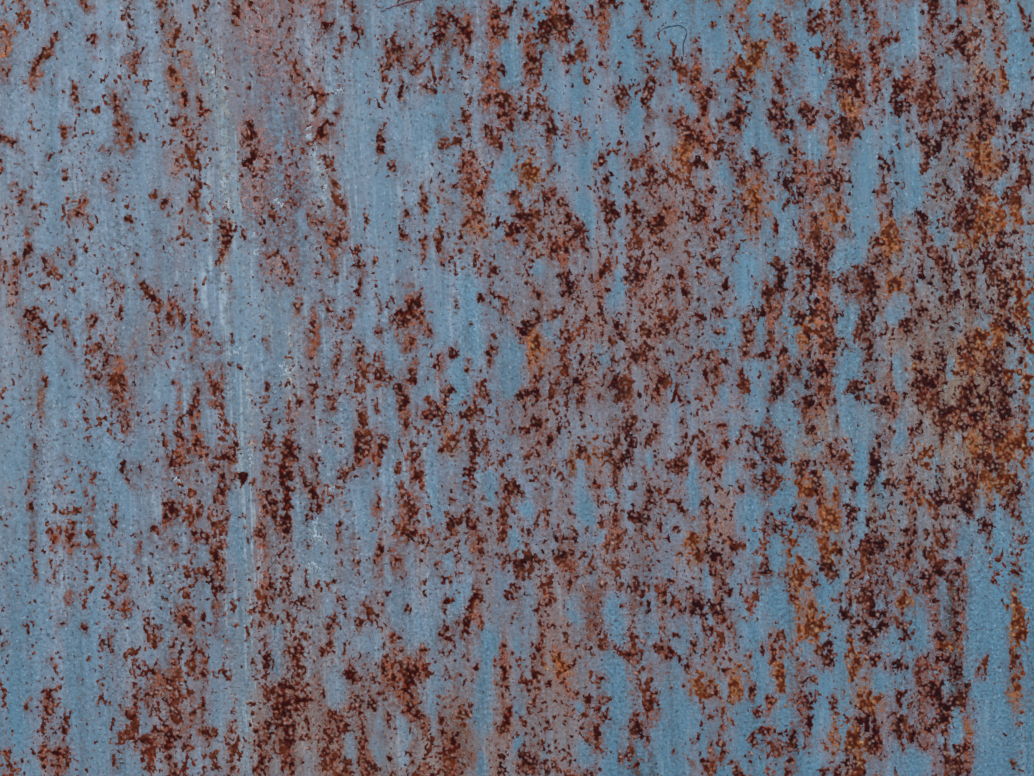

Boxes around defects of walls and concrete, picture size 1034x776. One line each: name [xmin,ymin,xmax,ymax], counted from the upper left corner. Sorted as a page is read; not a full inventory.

rust [0,0,73,92]
rust [0,127,31,175]
rust [1,172,33,246]
rust [31,198,48,227]
rust [122,193,140,241]
rust [20,374,49,431]
rust [335,521,361,567]
rust [3,583,42,667]
rust [0,629,104,776]
rust [93,677,111,706]